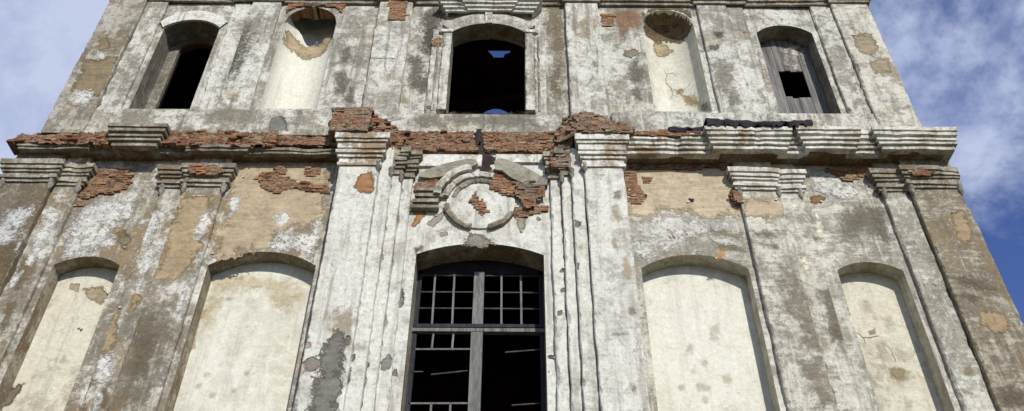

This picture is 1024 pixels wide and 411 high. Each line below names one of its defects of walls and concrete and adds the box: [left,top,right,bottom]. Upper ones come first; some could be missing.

spalling [282,3,347,60]
flaking render [642,7,694,57]
flaking render [0,106,702,312]
flaking render [624,163,785,261]